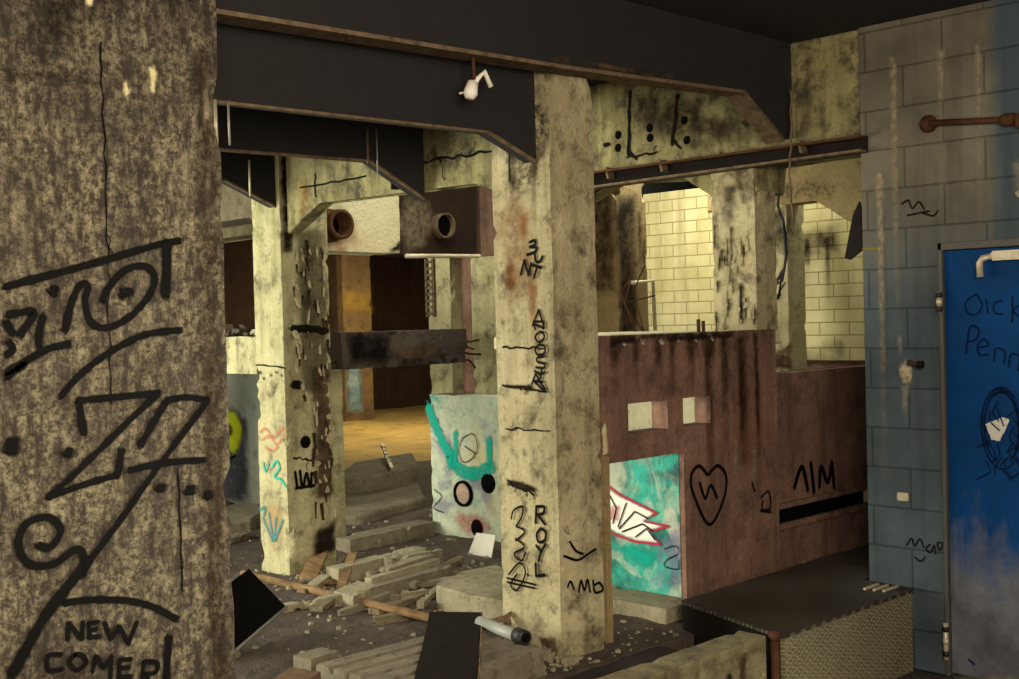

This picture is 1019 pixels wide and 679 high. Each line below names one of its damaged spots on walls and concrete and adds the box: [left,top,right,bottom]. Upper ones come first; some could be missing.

crack [424,142,492,180]
peeling [259,232,336,555]